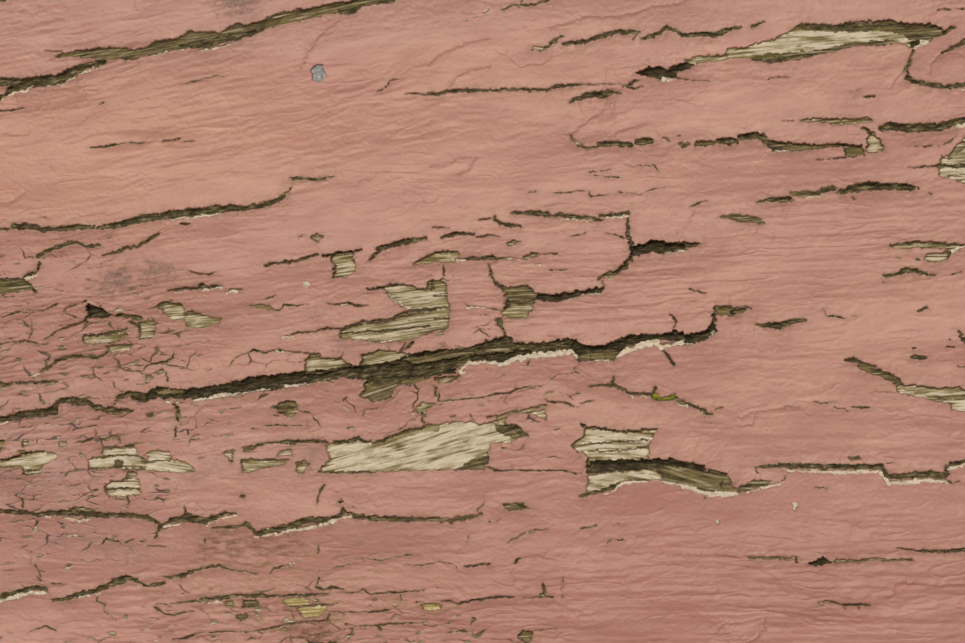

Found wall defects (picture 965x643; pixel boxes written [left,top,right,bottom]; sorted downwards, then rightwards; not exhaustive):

crack [0,0,398,113]
crack [530,20,765,52]
peeling [634,19,958,83]
crack [368,117,965,287]
peeling [906,137,965,184]
crack [0,186,293,341]
peeling [281,240,607,351]
crack [0,287,725,452]
peeling [843,356,965,413]
peeling [86,440,196,498]
peeling [222,402,739,500]
crack [0,484,565,643]